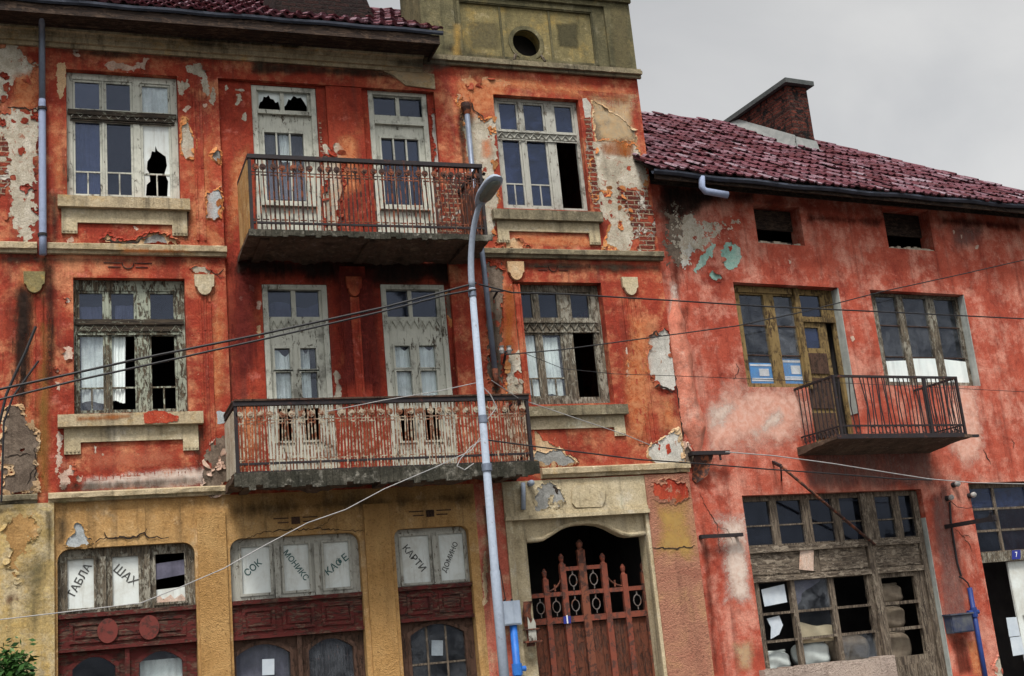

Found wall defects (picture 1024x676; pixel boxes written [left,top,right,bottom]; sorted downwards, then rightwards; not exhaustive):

flaking render [0,44,47,242]
flaking render [177,61,247,235]
flaking render [429,75,742,394]
flaking render [0,370,41,495]
flaking render [0,513,42,588]
leakage [12,265,53,483]
flaking render [63,521,96,549]
crack [92,529,169,544]
flaking render [531,430,579,511]
flaking render [625,322,694,465]
peeling [651,476,691,555]